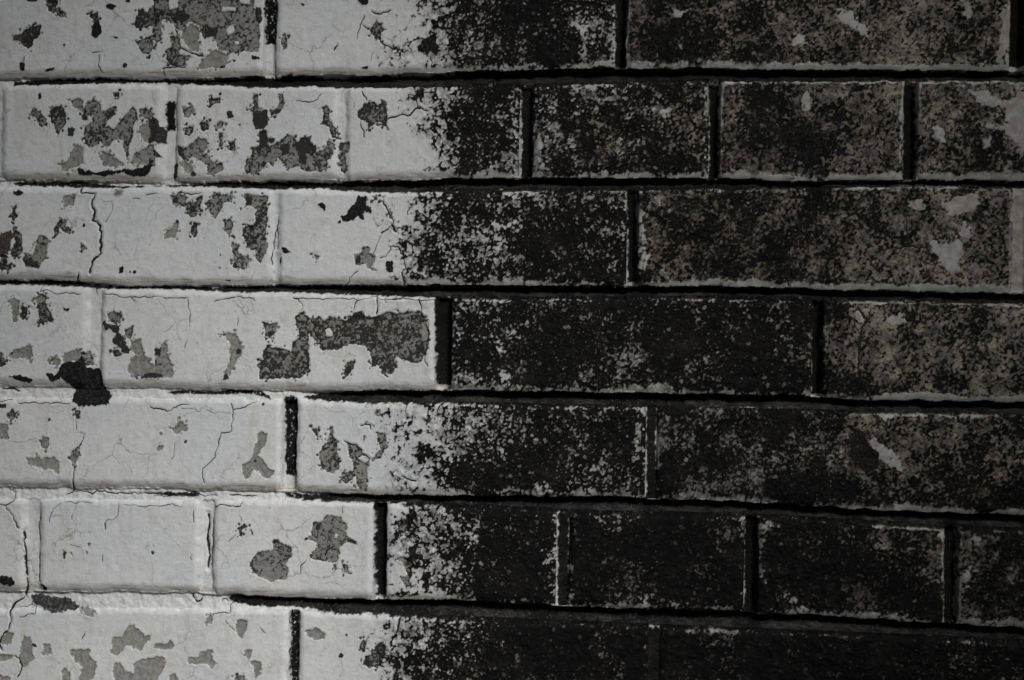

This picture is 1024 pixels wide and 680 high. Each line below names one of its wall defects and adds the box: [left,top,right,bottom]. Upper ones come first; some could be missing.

peeling [131,0,263,72]
peeling [28,91,341,179]
peeling [22,235,51,269]
crack [40,187,202,345]
peeling [163,191,270,271]
peeling [103,309,175,380]
peeling [256,309,431,382]
peeling [309,425,389,492]
crack [0,387,257,677]
peeling [249,539,294,582]
peeling [305,515,357,577]
peeling [110,625,178,680]